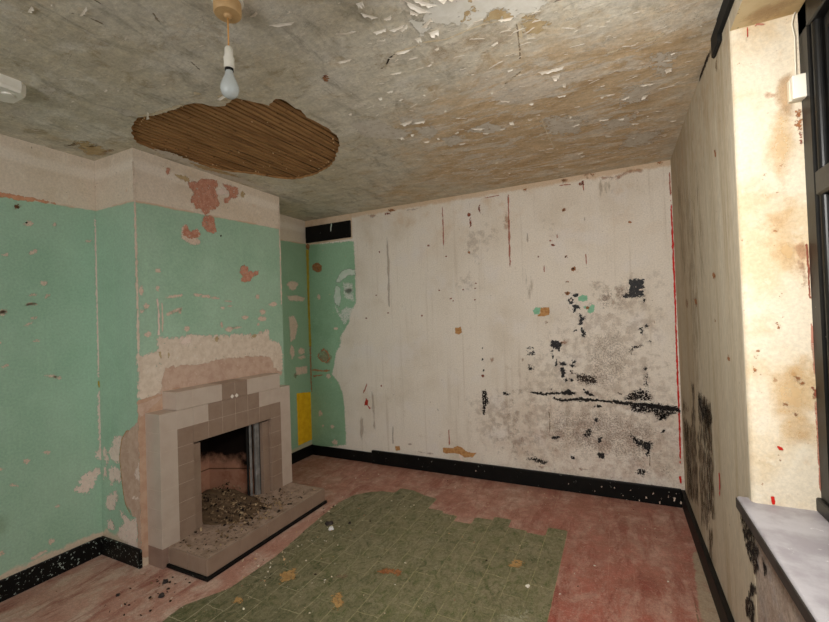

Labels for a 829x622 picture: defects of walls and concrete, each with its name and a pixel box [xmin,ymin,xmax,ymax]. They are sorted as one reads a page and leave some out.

peeling [356,0,557,69]
peeling [349,42,678,186]
spalling [533,307,550,316]
flaking render [74,149,307,558]
flaking render [443,430,476,461]
damp [582,418,605,459]
damp [624,367,715,560]